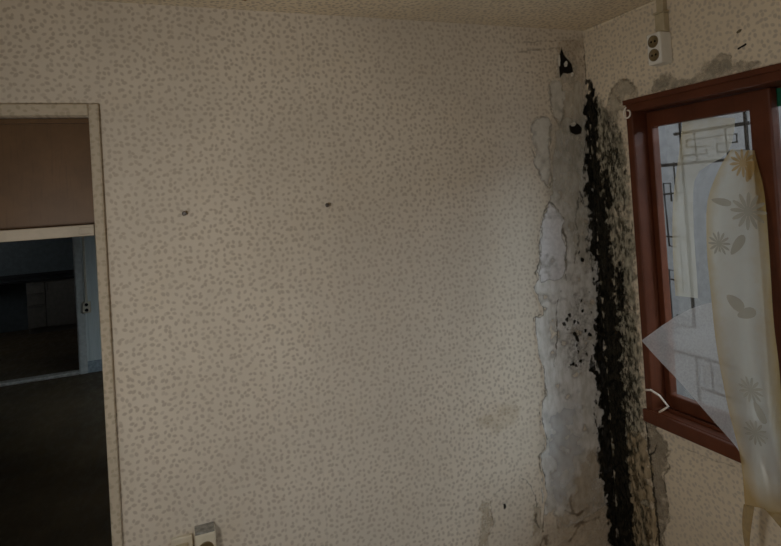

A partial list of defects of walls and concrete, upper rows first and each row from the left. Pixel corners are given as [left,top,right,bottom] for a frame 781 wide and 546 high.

flaking render [569,122,582,135]
peeling [539,202,575,283]
leakage [531,79,670,546]